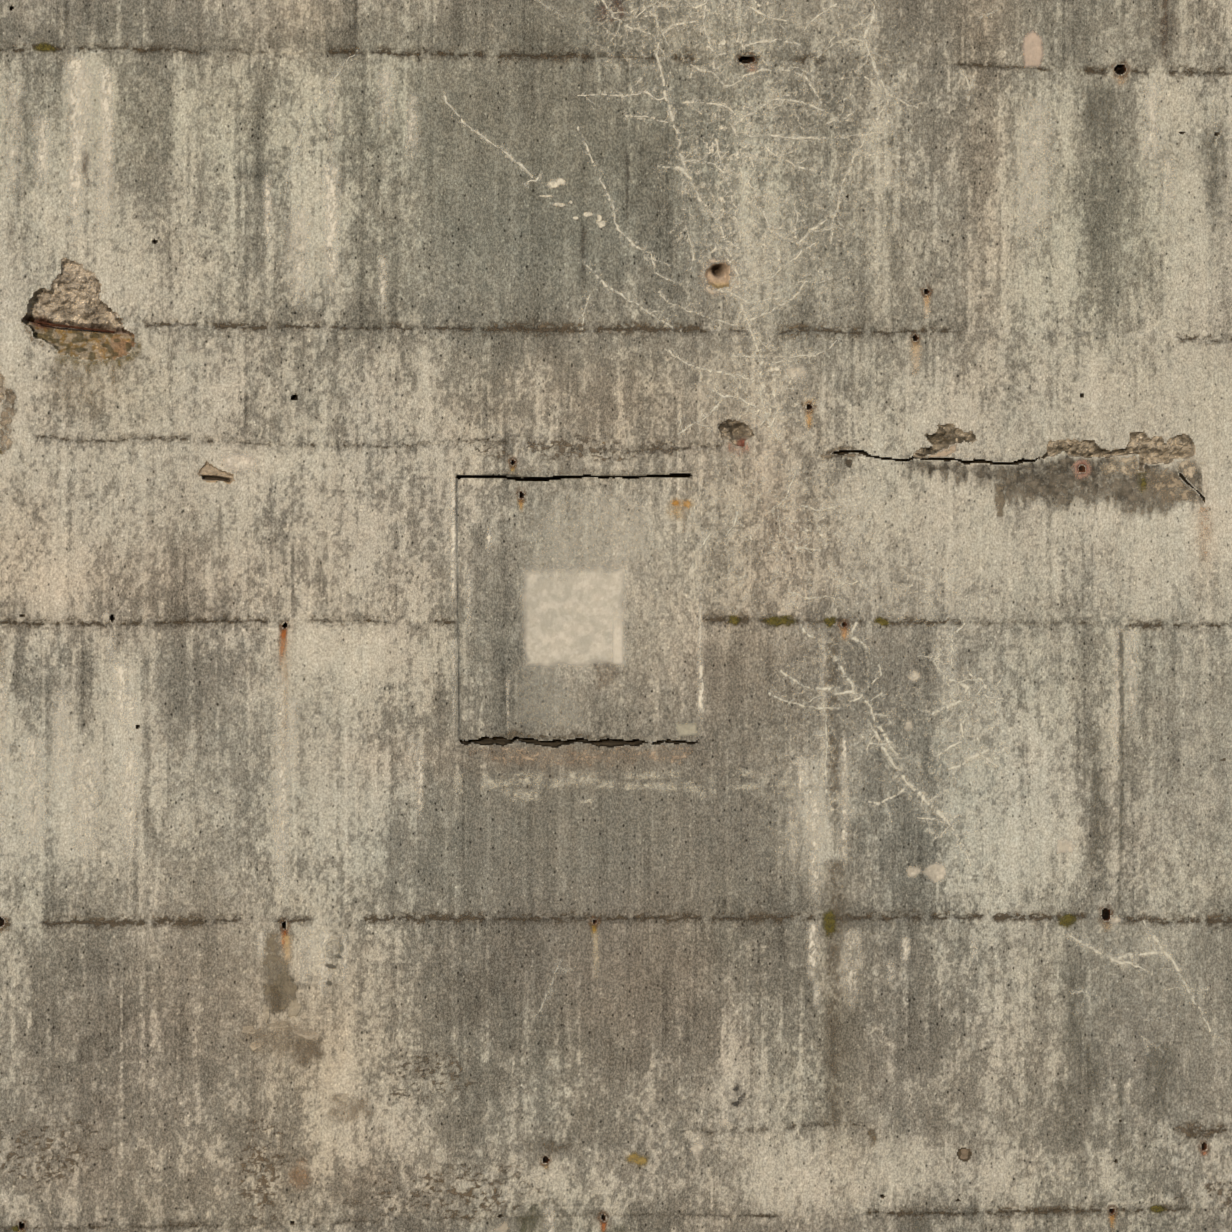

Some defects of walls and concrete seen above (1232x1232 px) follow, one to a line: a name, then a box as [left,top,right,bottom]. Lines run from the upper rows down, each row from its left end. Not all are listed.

spalling [21,258,140,371]
spalling [0,373,16,455]
spalling [197,461,235,484]
crack [821,446,1048,468]
spalling [909,423,1202,516]
corrosion [279,621,288,655]
crack [459,730,699,766]